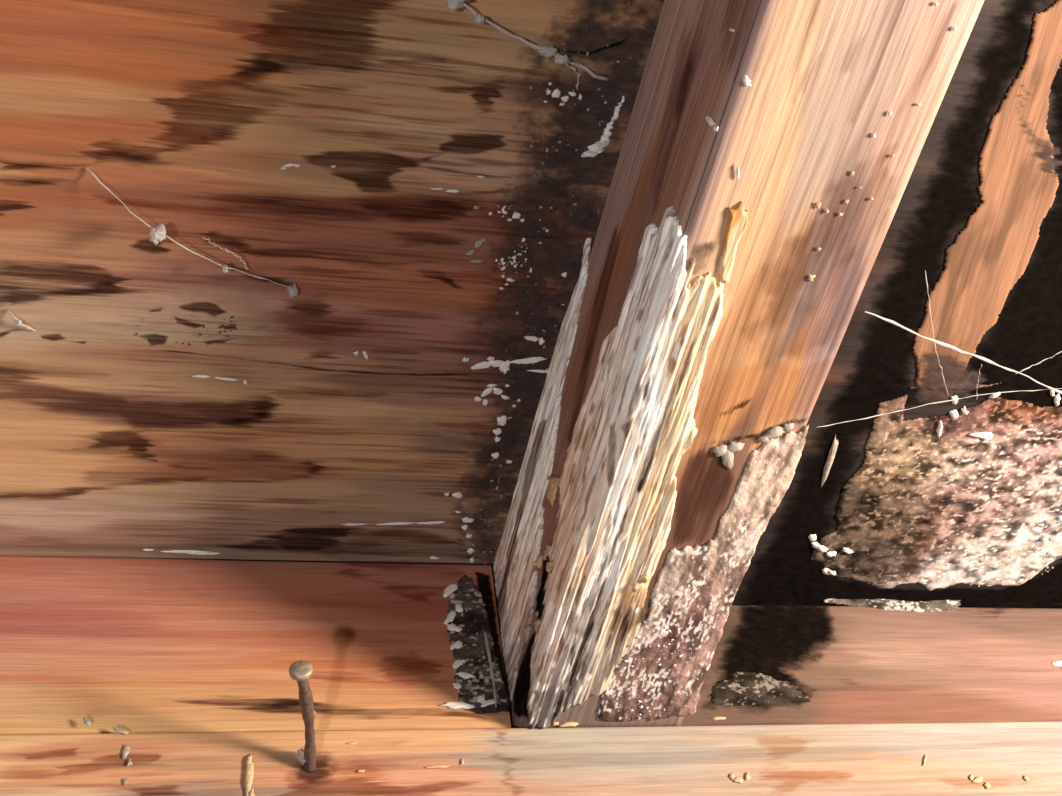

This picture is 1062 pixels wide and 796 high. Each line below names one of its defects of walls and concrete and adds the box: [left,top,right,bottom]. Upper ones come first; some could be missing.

water stain [312,153,415,188]
water stain [0,267,122,301]
water stain [441,0,664,565]
water stain [135,302,237,347]
water stain [597,0,1062,722]
spalling [533,554,555,626]
water stain [440,575,509,714]